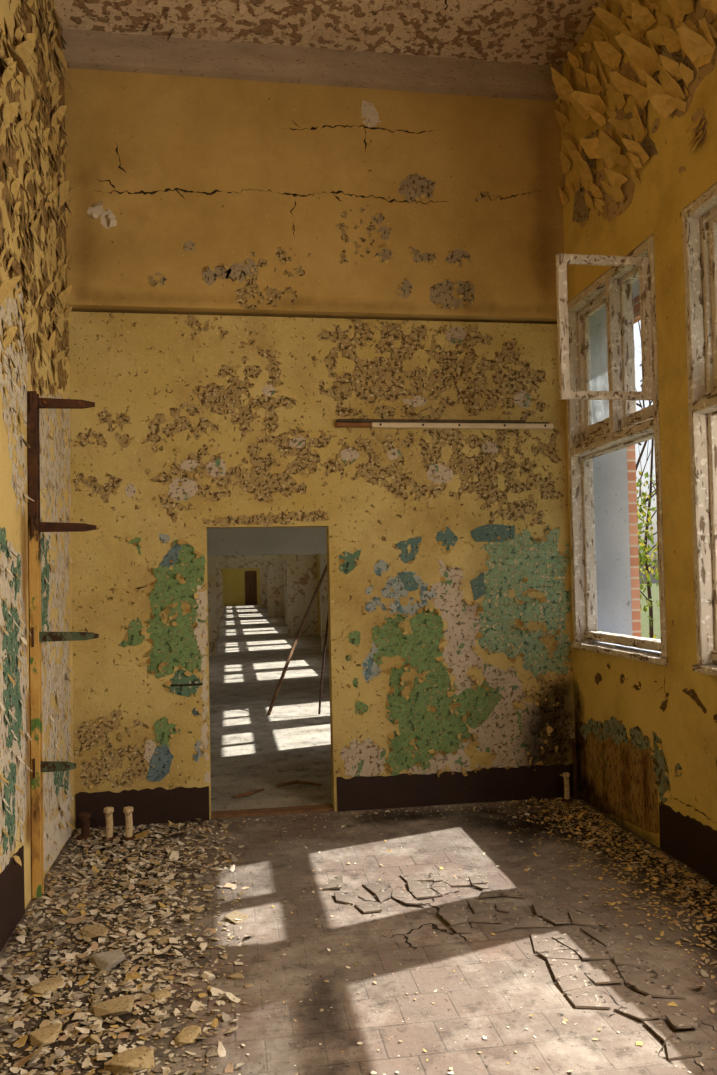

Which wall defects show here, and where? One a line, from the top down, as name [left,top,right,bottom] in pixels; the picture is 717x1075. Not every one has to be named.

crack [281,121,440,152]
crack [94,142,446,239]
peeling [0,0,717,834]
damp [528,684,632,831]
peeling [512,807,610,862]
crack [358,886,474,950]
crack [647,1020,704,1074]